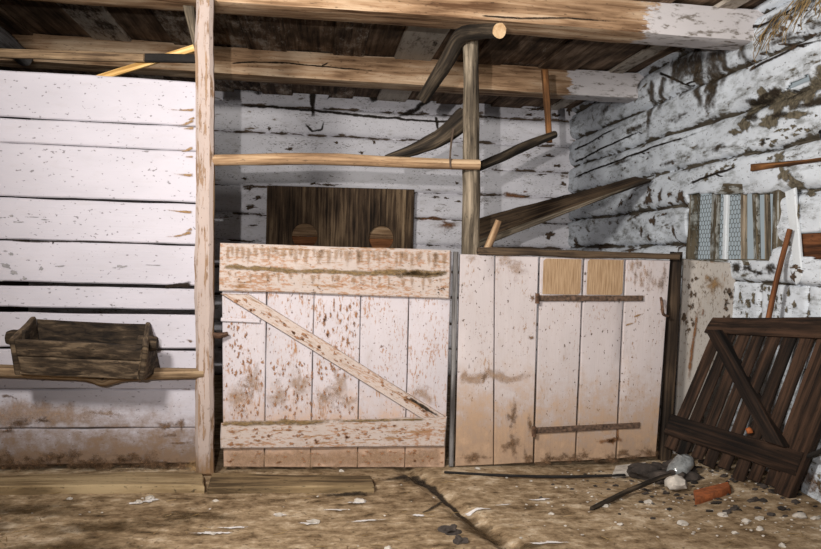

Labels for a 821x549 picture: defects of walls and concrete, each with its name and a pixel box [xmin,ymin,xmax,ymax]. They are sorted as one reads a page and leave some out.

peeling [728,64,821,197]
peeling [633,186,688,241]